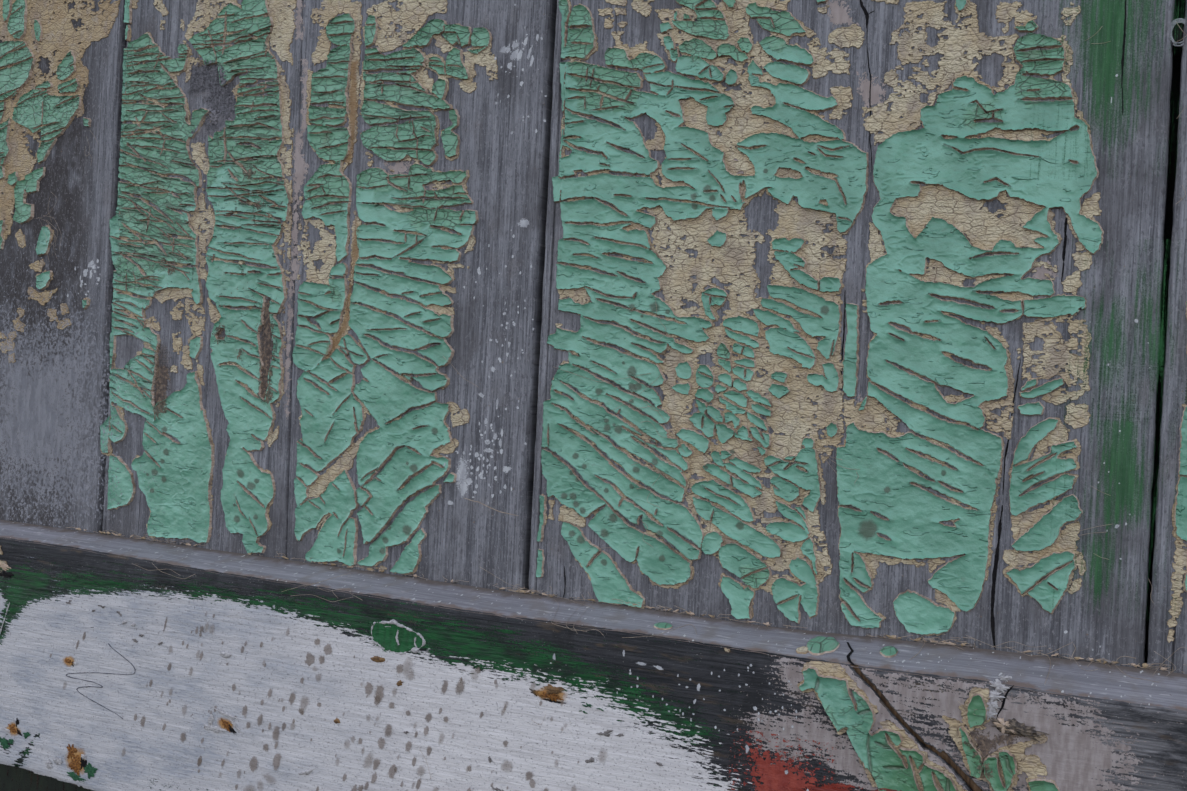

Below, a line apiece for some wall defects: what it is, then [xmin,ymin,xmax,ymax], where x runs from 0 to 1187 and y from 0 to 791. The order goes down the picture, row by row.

peeling [0,0,498,575]
peeling [536,0,1104,636]
peeling [1167,404,1187,643]
crack [847,642,983,791]
peeling [734,636,1184,791]
crack [996,685,1014,734]